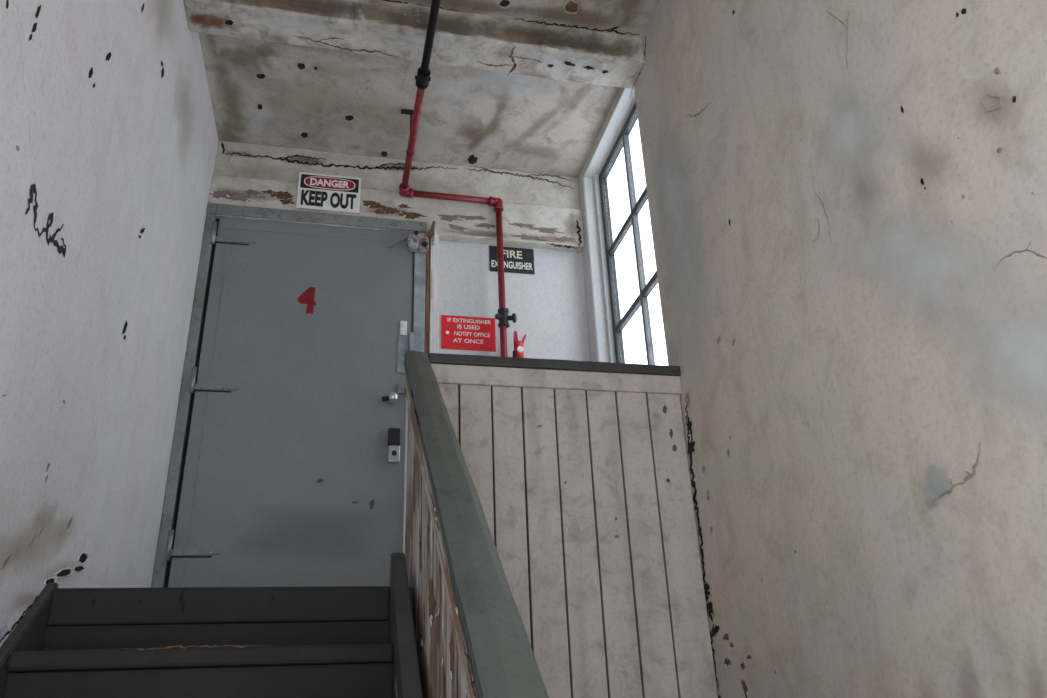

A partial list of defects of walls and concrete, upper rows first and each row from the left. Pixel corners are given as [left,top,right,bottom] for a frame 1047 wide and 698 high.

water stain [205,0,648,201]
crack [221,142,573,189]
peeling [362,201,578,243]
peeling [670,393,695,455]
crack [932,442,980,505]
peeling [413,457,477,698]
peeling [705,582,752,698]